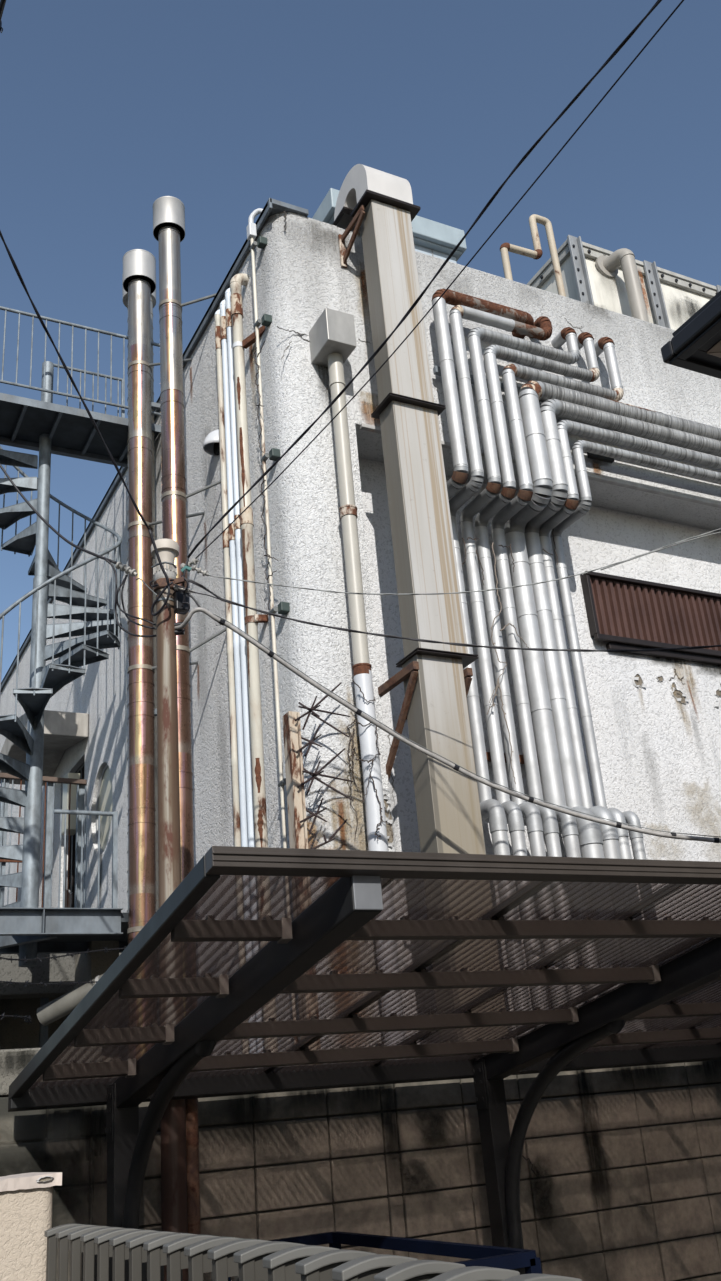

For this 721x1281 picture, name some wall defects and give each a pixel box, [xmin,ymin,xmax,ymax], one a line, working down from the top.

spalling [632,673,690,705]
damp [613,1064,665,1080]
damp [577,1070,609,1192]